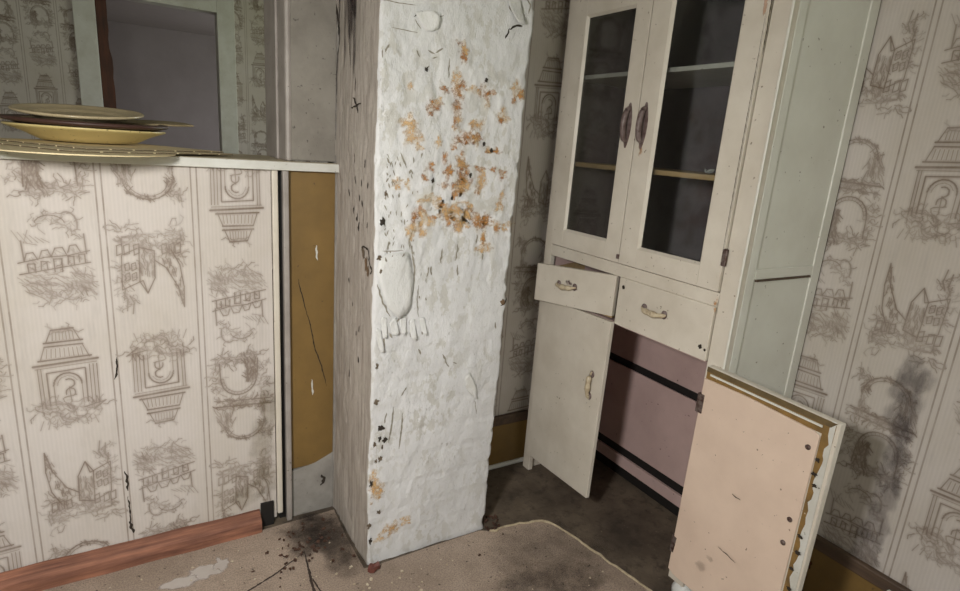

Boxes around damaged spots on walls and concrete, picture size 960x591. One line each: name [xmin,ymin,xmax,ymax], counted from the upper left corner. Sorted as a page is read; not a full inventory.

rust [406,72,507,253]